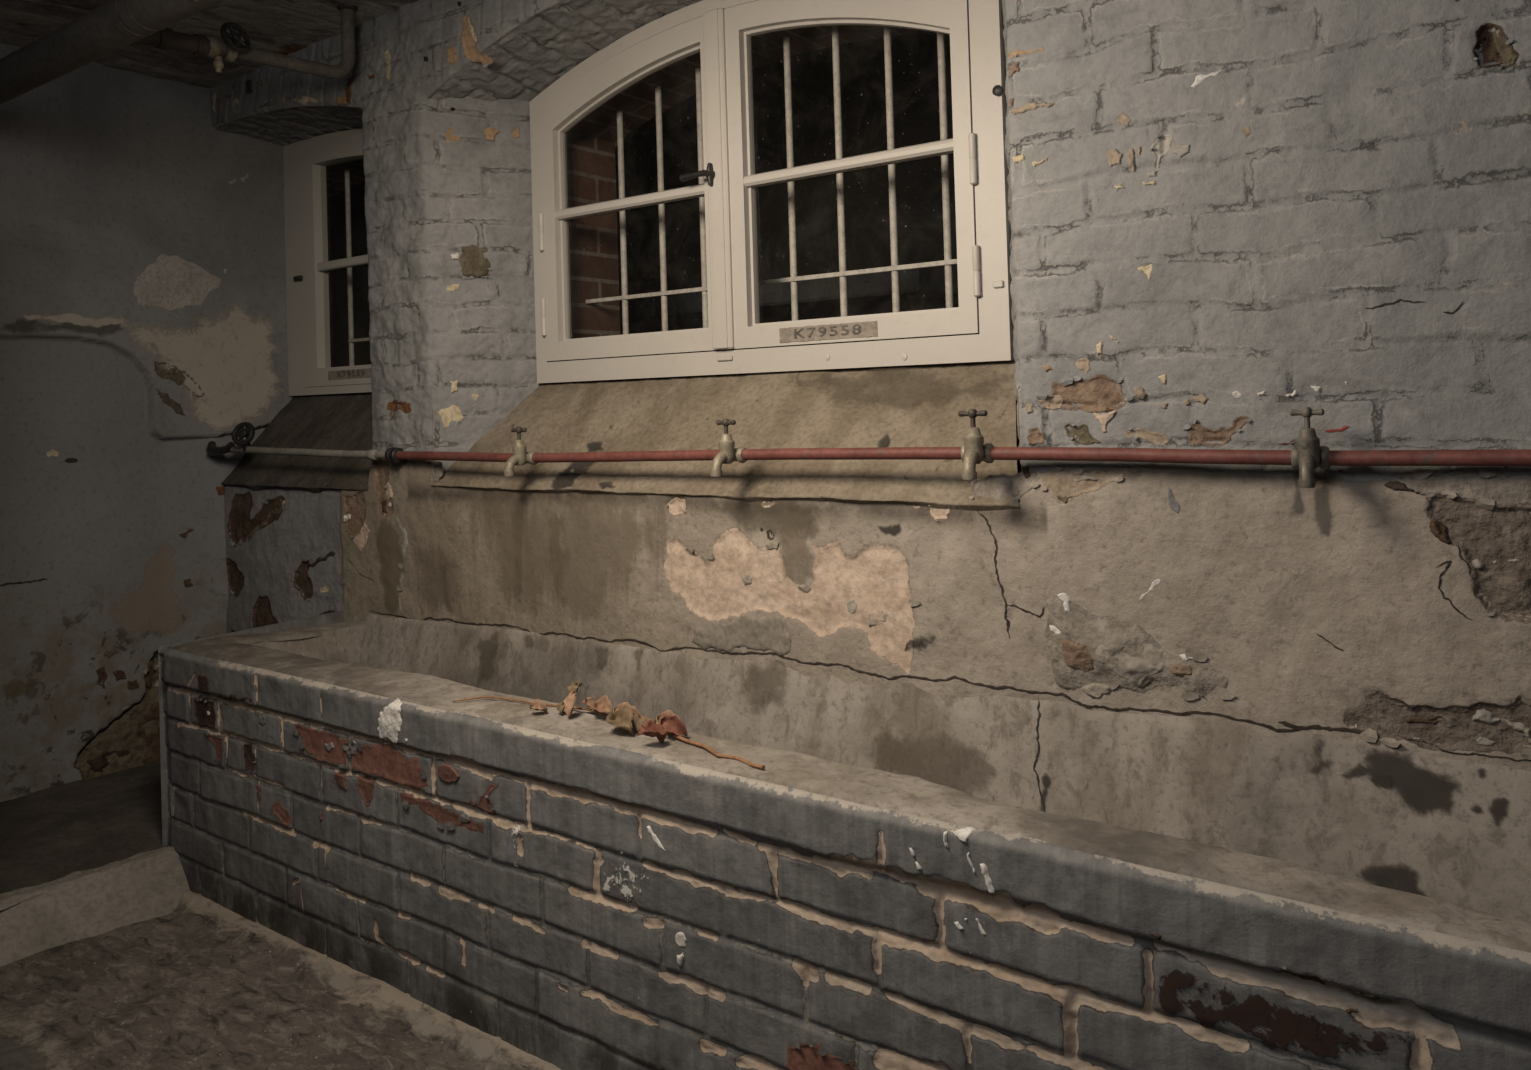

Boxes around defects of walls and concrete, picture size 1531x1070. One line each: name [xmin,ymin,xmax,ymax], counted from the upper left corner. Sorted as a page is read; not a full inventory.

peeling [1025,335,1266,447]
flaking render [969,466,1130,504]
spalling [216,486,286,632]
spalling [664,527,921,674]
crack [977,510,1044,638]
crack [1437,545,1472,620]
spalling [1384,467,1531,623]
crack [348,559,1531,811]
leakage [1313,743,1457,813]
spalling [1343,690,1531,760]
leakage [1361,865,1425,896]
peeling [1159,965,1406,1062]